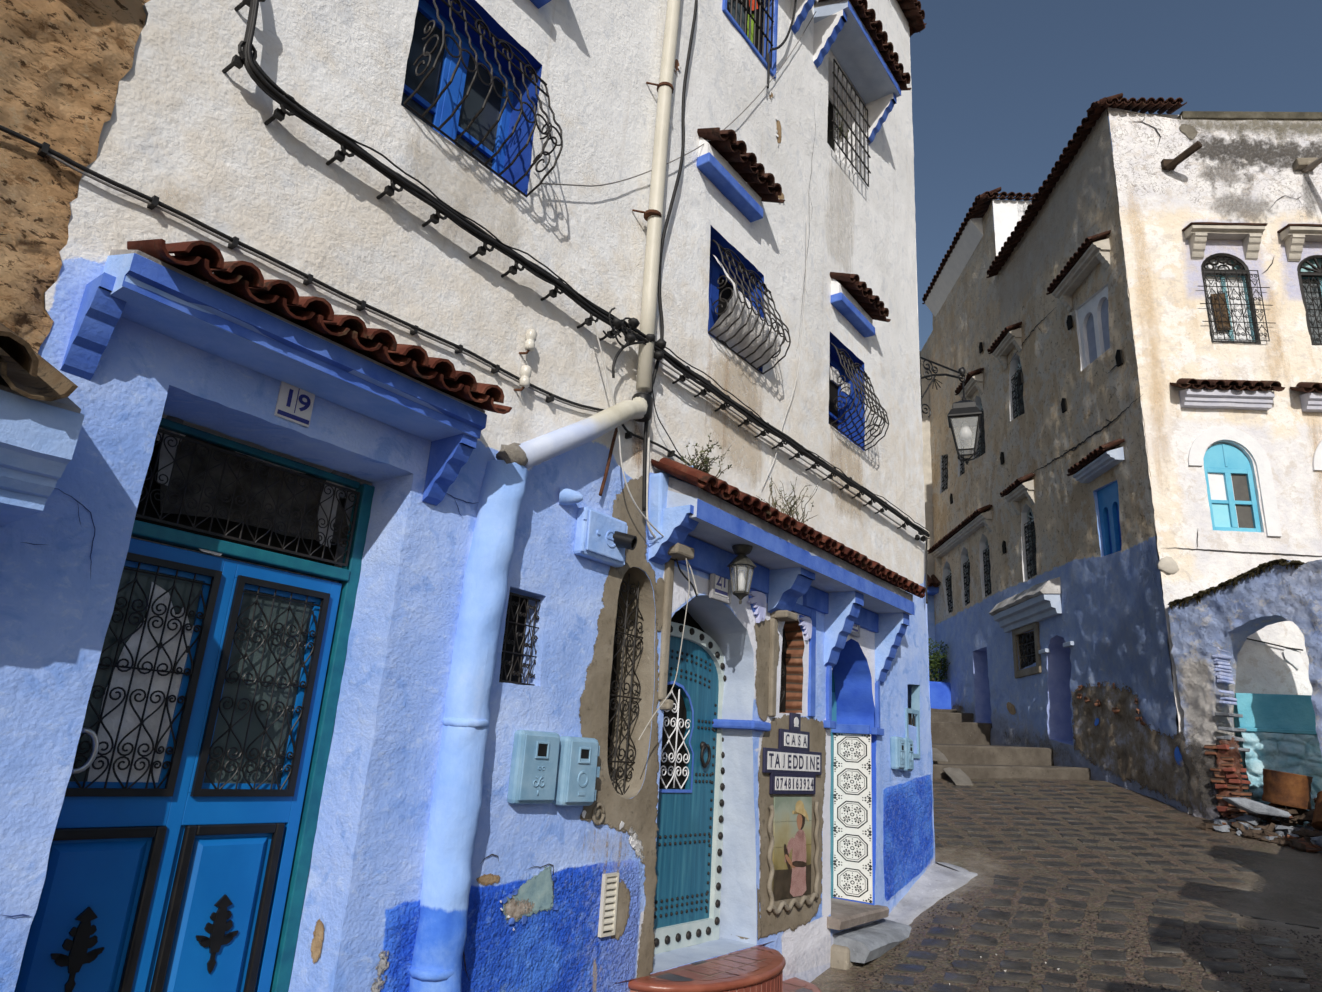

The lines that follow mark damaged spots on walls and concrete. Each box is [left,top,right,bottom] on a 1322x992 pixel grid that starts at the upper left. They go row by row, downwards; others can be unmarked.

leakage [1181,119,1322,221]
spalling [14,313,30,335]
flaking render [1071,681,1243,818]
peeling [500,865,558,931]
peeling [311,919,324,964]